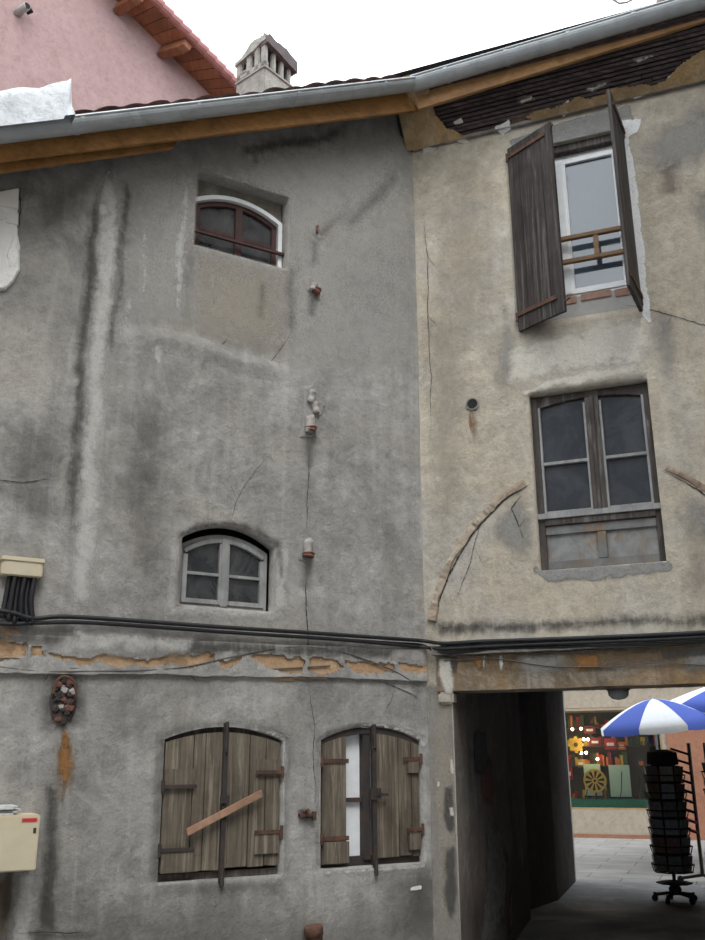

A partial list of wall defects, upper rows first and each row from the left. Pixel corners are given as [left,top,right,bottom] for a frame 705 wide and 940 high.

peeling [495,120,511,135]
water stain [175,187,188,309]
crack [622,304,705,326]
water stain [68,176,129,603]
crack [305,568,314,645]
crack [438,486,527,607]
rust [58,732,73,783]
peeling [0,628,456,925]
water stain [13,788,56,940]